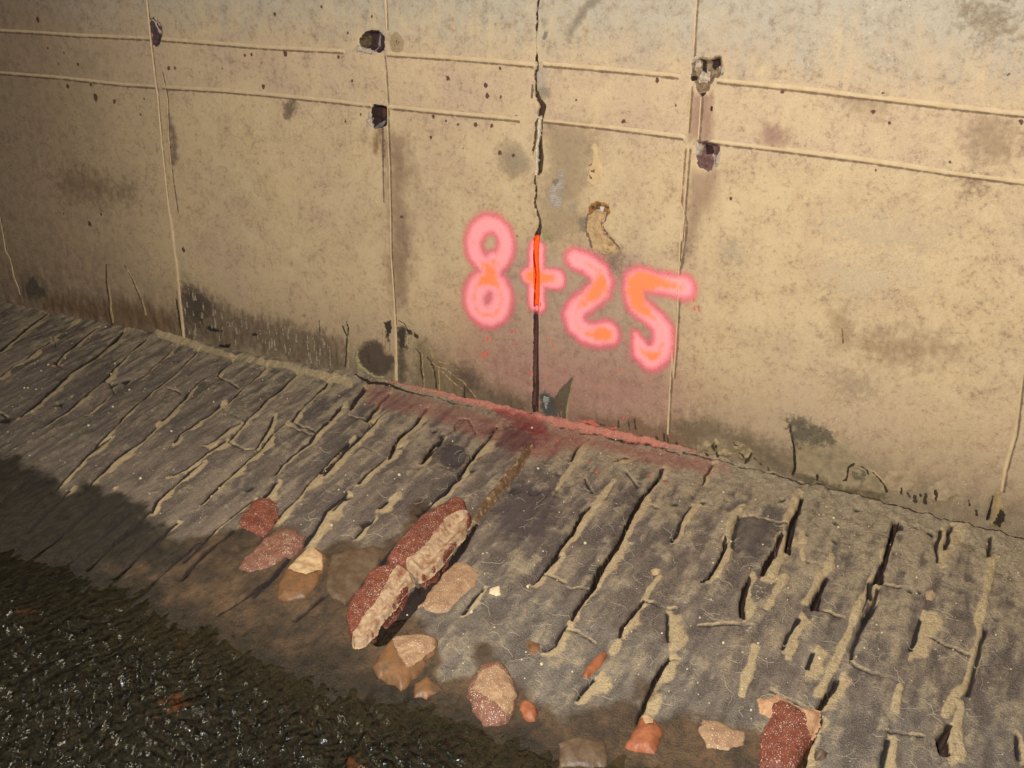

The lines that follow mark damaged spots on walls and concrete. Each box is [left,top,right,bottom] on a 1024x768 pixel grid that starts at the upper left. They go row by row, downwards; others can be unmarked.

spalling [347,15,385,55]
spalling [360,104,387,154]
crack [531,0,546,240]
spalling [690,55,724,172]
spalling [584,201,620,256]
leakage [355,321,419,379]
crack [319,309,539,476]
crack [374,443,531,647]
crack [560,424,1024,621]
crack [636,660,670,725]
crack [817,680,839,714]
crack [935,725,952,757]